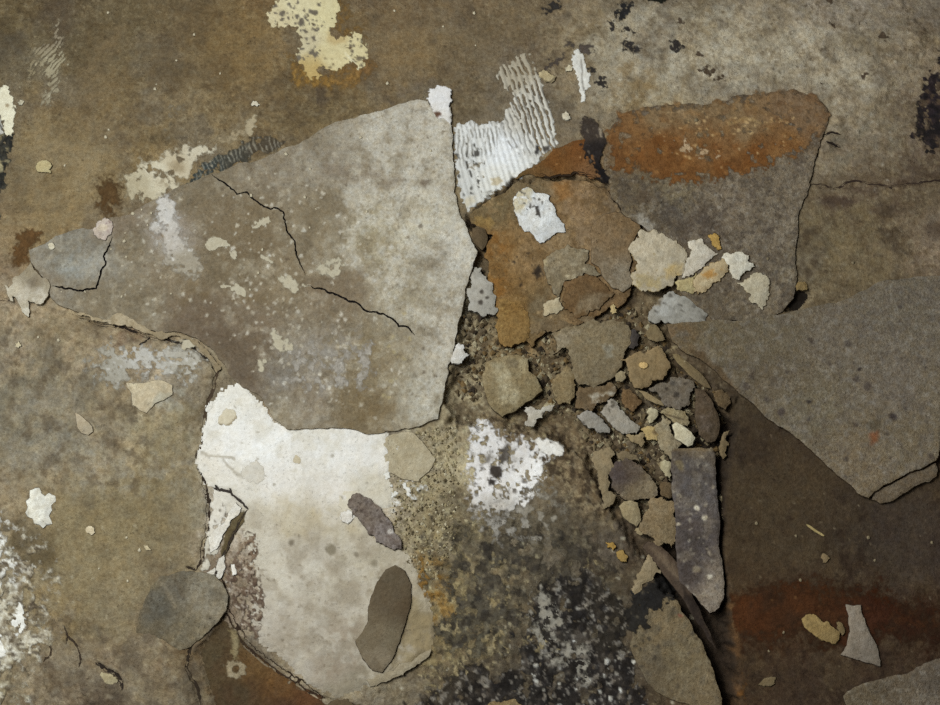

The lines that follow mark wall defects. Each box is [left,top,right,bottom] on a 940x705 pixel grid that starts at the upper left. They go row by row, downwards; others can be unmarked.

spalling [562,111,610,184]
rust [604,89,831,186]
crack [212,175,415,335]
peeling [543,297,564,317]
flaking render [451,343,471,365]
flaking render [524,405,555,427]
flaking render [577,410,610,434]
peeling [656,460,672,482]
flaking render [195,383,436,698]
water stain [403,418,678,705]
peeling [606,542,628,562]
rust [730,573,940,659]